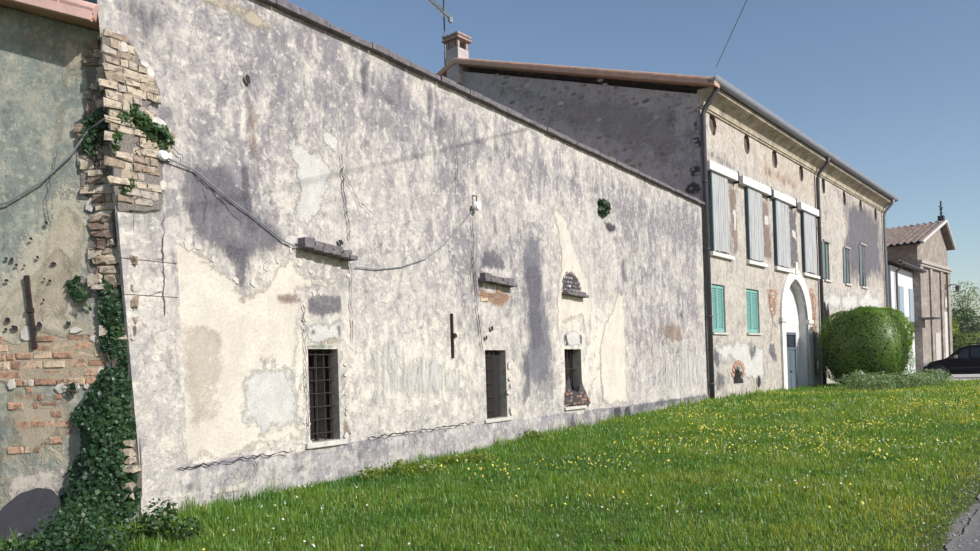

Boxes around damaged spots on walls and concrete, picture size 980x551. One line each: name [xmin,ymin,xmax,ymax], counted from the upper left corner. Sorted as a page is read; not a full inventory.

flaking render [0,28,175,454]
damp [183,165,281,285]
peeling [151,234,351,464]
peeling [288,131,339,224]
flaking render [478,290,510,306]
damp [524,240,551,398]
peeling [552,208,627,406]